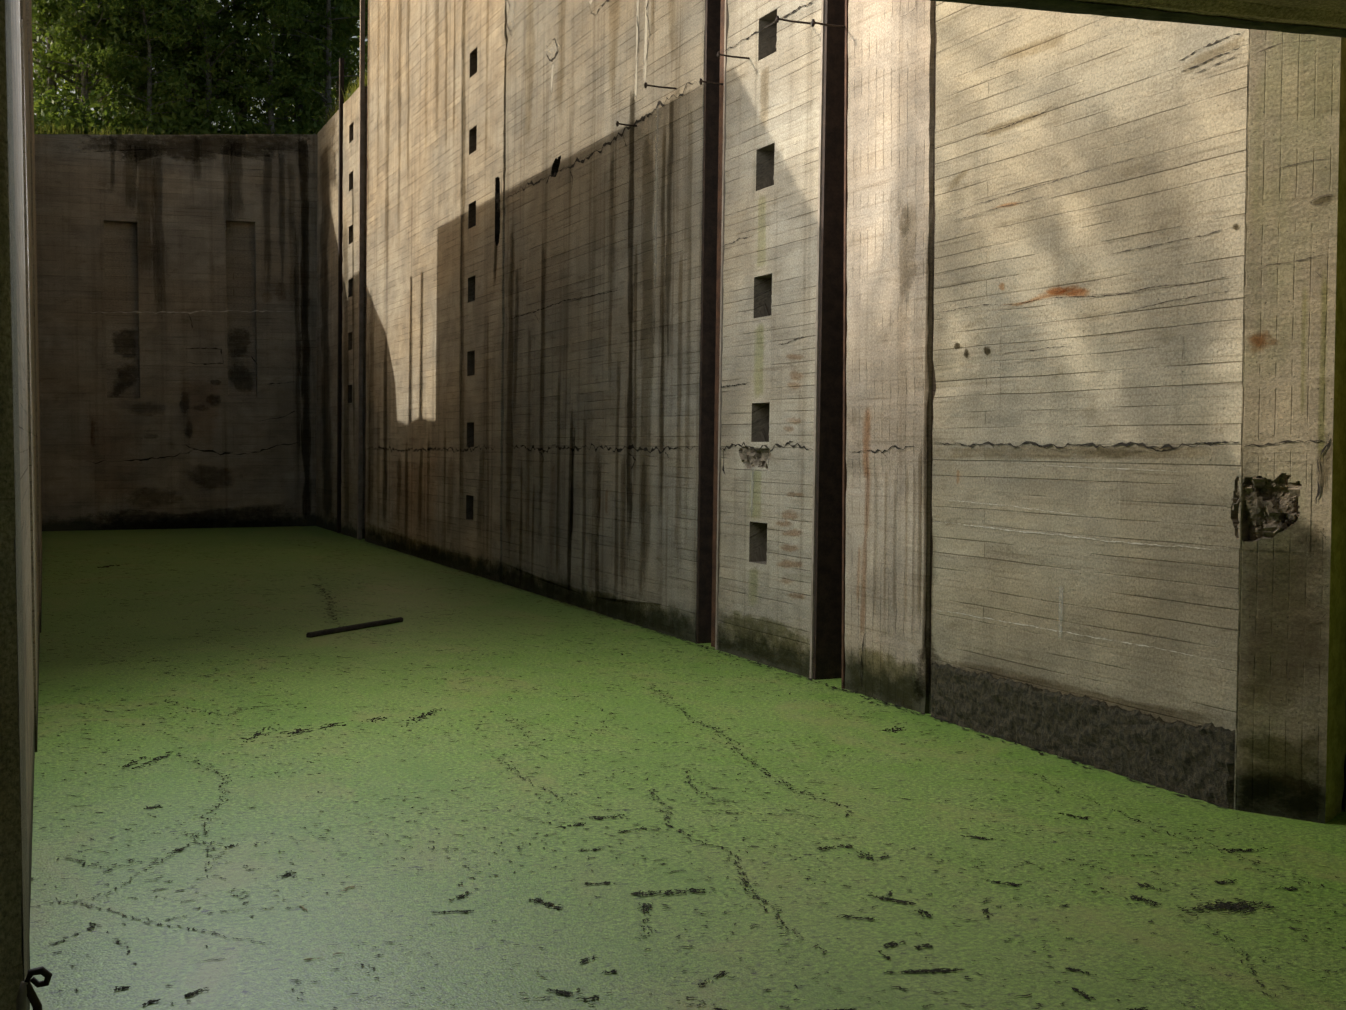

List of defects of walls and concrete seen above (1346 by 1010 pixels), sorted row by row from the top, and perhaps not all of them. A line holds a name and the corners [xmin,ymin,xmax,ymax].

leakage [94,136,311,516]
crack [366,441,811,474]
spalling [735,442,773,474]
crack [852,338,1329,463]
spalling [1226,439,1331,553]